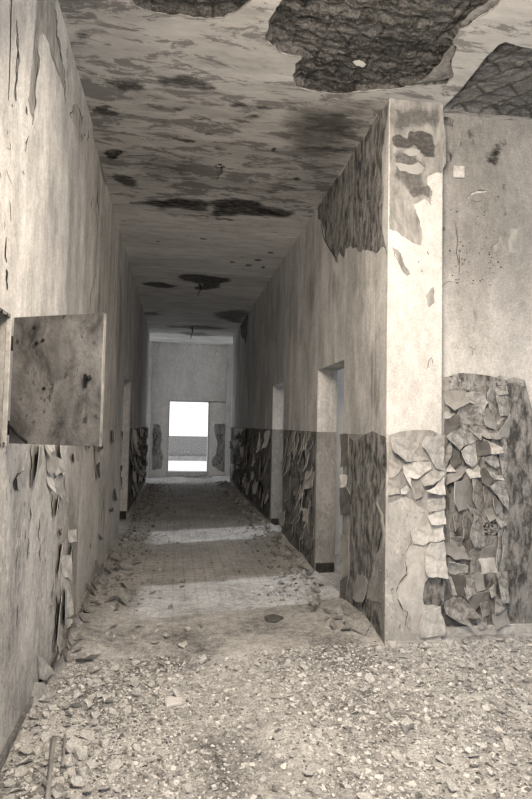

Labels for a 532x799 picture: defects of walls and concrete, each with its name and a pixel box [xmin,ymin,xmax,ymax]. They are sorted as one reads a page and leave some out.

spalling [130,0,251,19]
spalling [265,0,501,94]
peeling [27,0,89,142]
leakage [104,79,144,91]
leakage [158,75,212,90]
leakage [93,105,118,116]
leakage [114,175,136,186]
peeling [317,101,410,276]
leakage [147,198,293,221]
leakage [142,274,230,290]
peeling [6,424,163,549]
peeling [339,373,532,638]